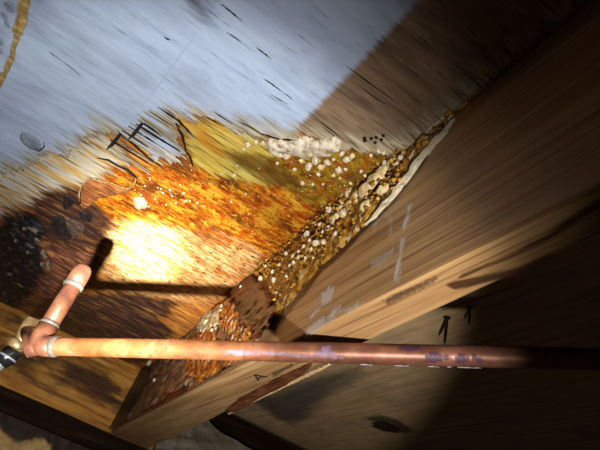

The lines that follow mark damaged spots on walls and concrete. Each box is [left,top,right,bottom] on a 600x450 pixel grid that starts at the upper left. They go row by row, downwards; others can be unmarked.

peeling [78,158,137,209]
water stain [0,133,392,339]